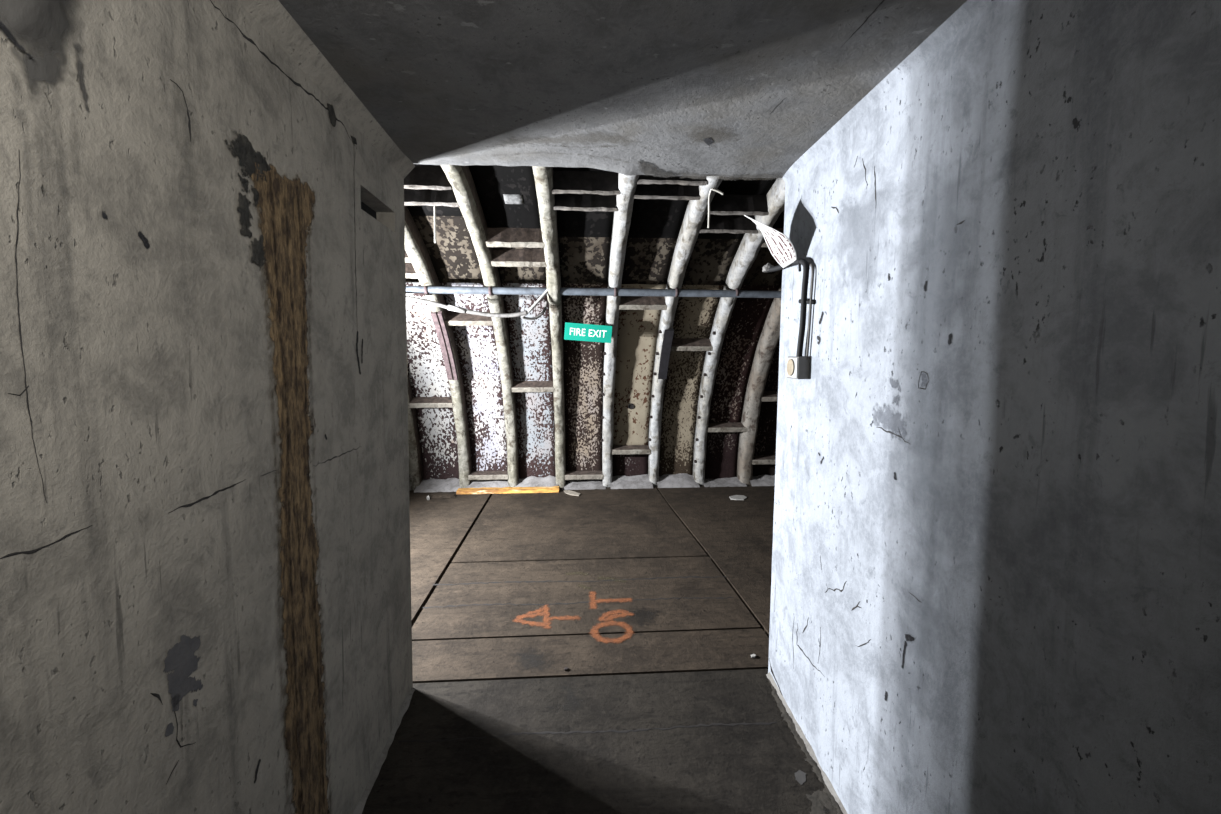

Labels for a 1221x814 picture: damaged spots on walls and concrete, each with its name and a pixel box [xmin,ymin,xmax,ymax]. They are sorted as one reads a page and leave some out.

crack [169,470,276,513]
corrosion [251,162,331,814]
crack [0,525,92,559]